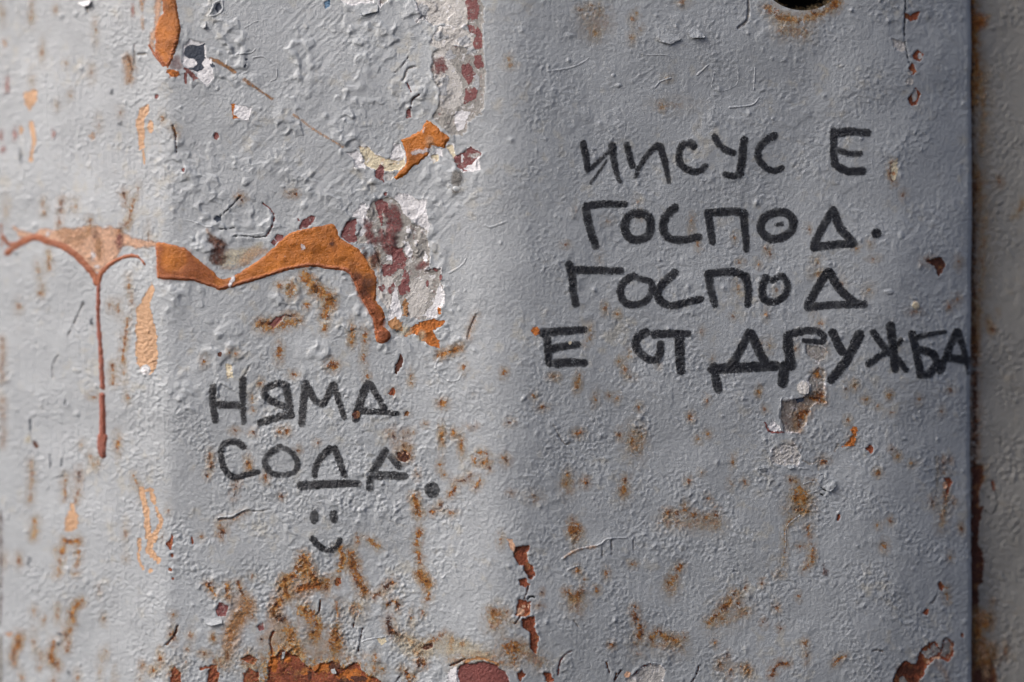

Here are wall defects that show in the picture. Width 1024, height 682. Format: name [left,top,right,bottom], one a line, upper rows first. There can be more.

peeling [206,0,224,18]
corrosion [764,0,841,24]
peeling [182,39,215,86]
peeling [341,0,486,348]
peeling [297,215,315,229]
peeling [217,351,250,379]
peeling [760,343,828,473]
corrosion [199,536,465,682]
corrosion [489,608,515,630]
corrosion [501,641,526,682]